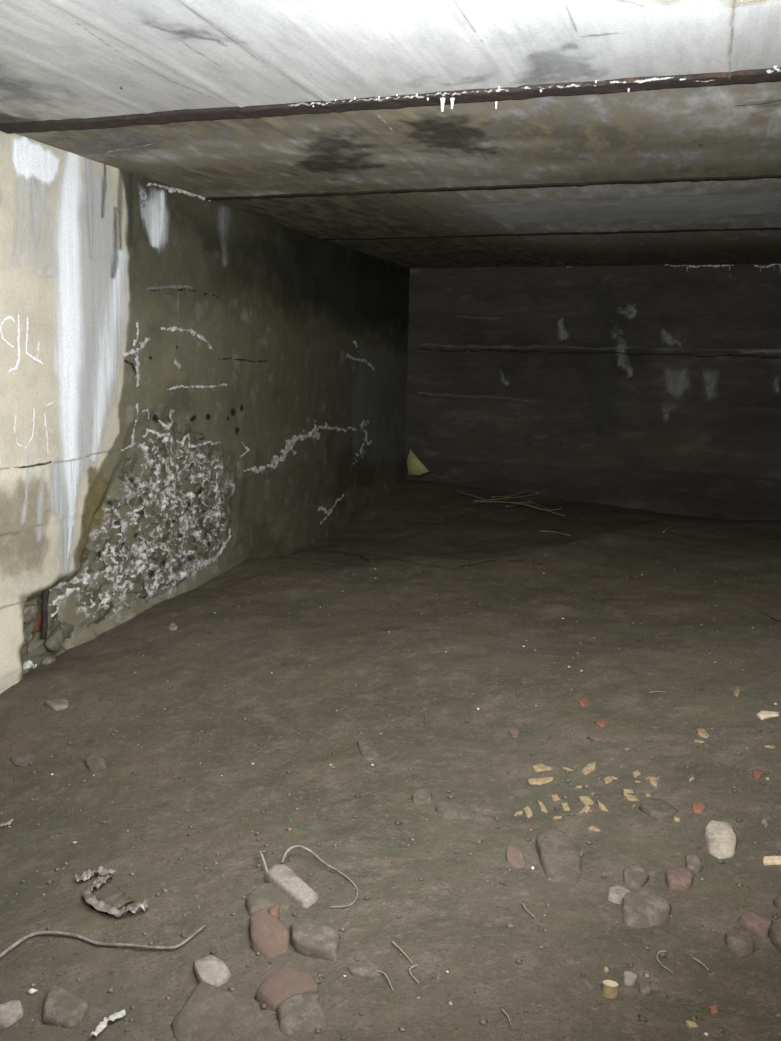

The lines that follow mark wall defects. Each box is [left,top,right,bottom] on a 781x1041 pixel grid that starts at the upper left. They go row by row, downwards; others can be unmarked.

leakage [610,77,713,92]
leakage [0,114,211,572]
spalling [20,414,238,674]
crack [121,358,357,473]